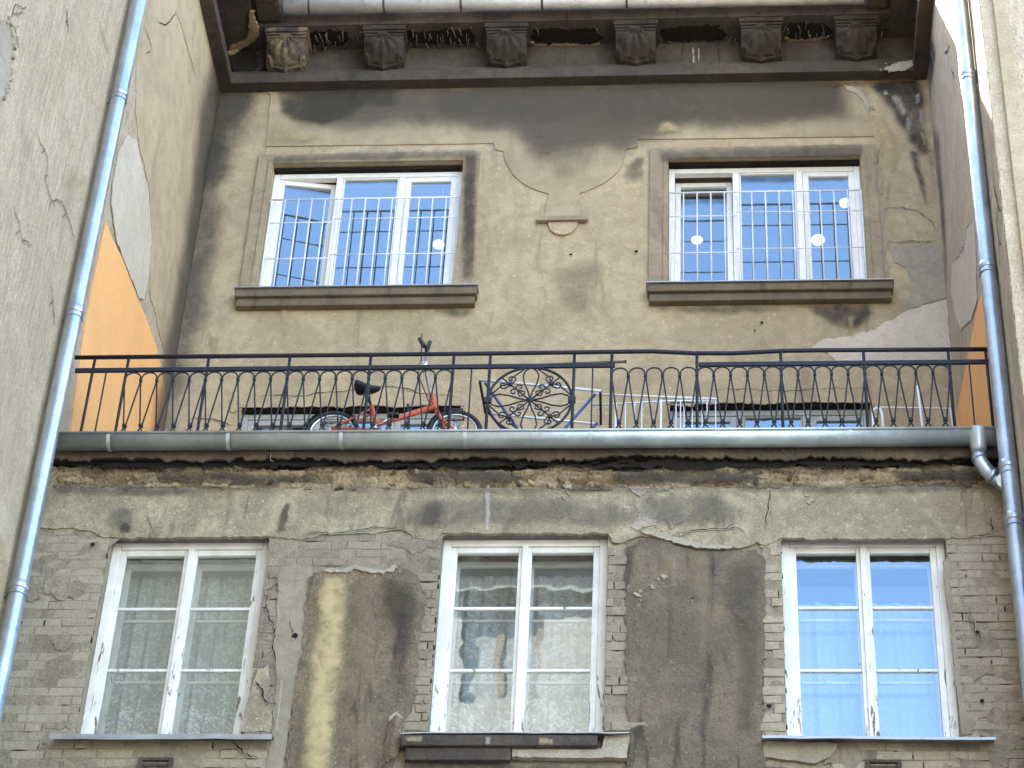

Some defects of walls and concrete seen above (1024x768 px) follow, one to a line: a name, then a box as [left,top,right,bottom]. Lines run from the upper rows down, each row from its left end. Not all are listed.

flaking render [228,10,260,72]
spalling [407,29,476,48]
spalling [530,27,604,46]
spalling [660,24,728,44]
crack [38,136,77,242]
water stain [874,42,945,240]
spalling [49,460,991,550]
spalling [0,522,447,768]
crack [255,590,294,704]
water stain [306,578,346,768]
spalling [824,525,1024,768]